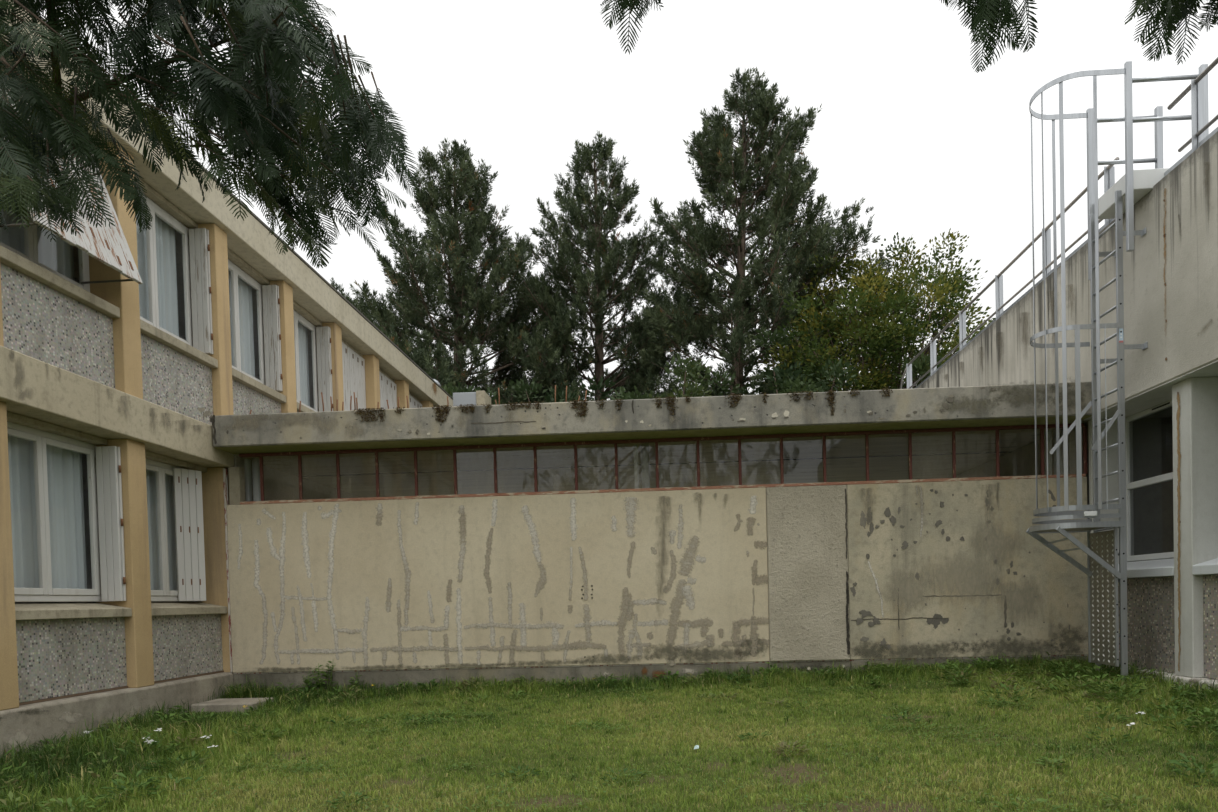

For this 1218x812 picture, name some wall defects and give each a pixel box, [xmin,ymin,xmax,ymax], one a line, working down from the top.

flaking render [860,489,968,557]
crack [845,489,1007,655]
flaking render [856,610,891,650]
flaking render [925,603,960,643]
leakage [854,624,1086,659]